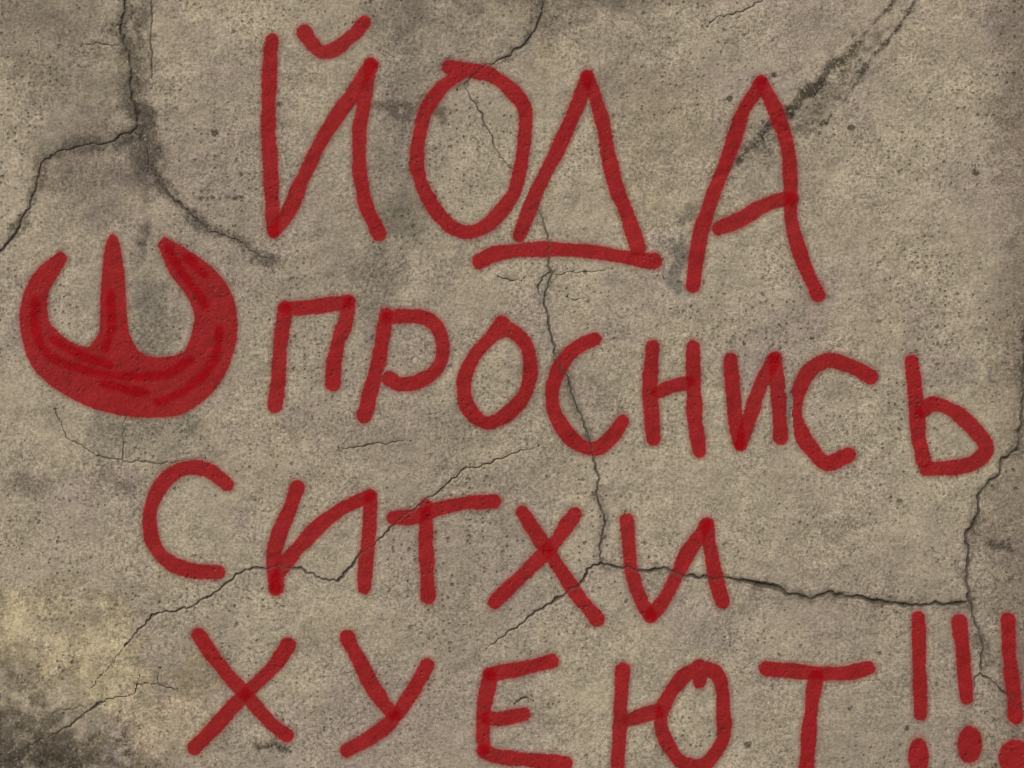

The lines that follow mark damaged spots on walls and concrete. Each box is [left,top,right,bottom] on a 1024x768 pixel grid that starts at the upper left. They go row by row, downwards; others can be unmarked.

crack [0,0,278,266]
crack [455,0,548,173]
crack [705,0,767,28]
crack [52,409,205,478]
crack [339,438,410,452]
crack [485,204,1024,714]
crack [16,444,539,754]